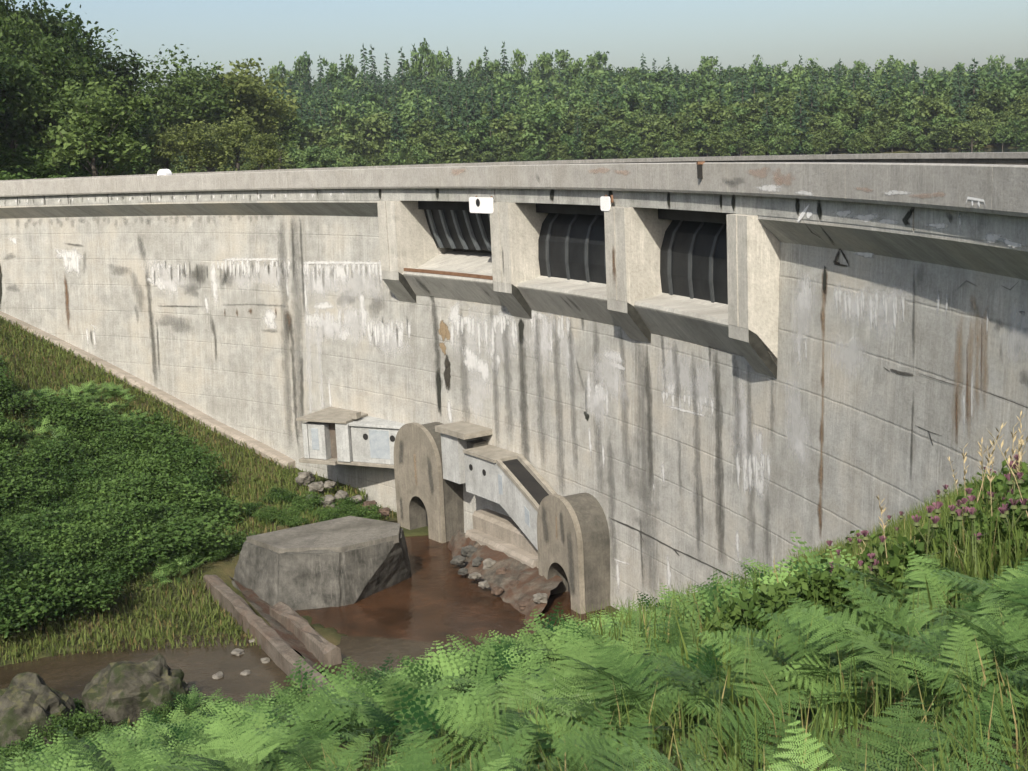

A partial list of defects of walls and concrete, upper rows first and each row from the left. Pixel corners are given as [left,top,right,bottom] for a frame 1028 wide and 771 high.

water stain [146,226,411,374]
water stain [286,318,303,441]
water stain [584,350,624,469]
water stain [646,340,739,555]
water stain [736,405,770,494]
corrosion [955,324,987,433]